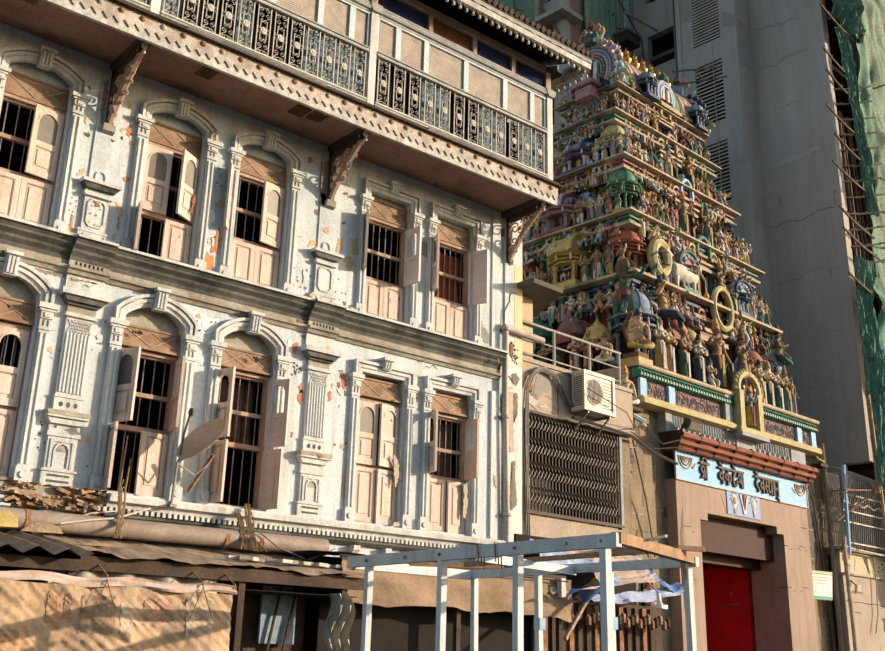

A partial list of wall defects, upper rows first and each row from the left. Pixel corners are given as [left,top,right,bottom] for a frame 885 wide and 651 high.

peeling [112,201,124,240]
peeling [205,200,225,270]
peeling [336,238,359,272]
peeling [196,312,220,334]
peeling [288,339,304,405]
peeling [327,370,349,402]